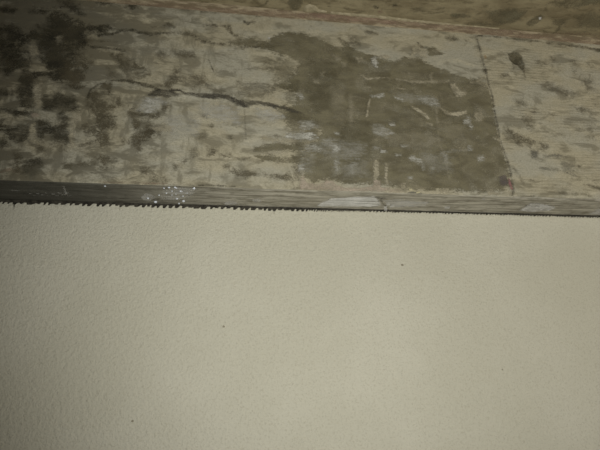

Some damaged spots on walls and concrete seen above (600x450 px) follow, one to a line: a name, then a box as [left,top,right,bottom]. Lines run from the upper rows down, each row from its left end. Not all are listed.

water stain [0,1,150,116]
water stain [0,94,76,146]
water stain [82,83,120,147]
water stain [129,97,170,151]
crack [87,79,298,113]
water stain [211,25,510,193]